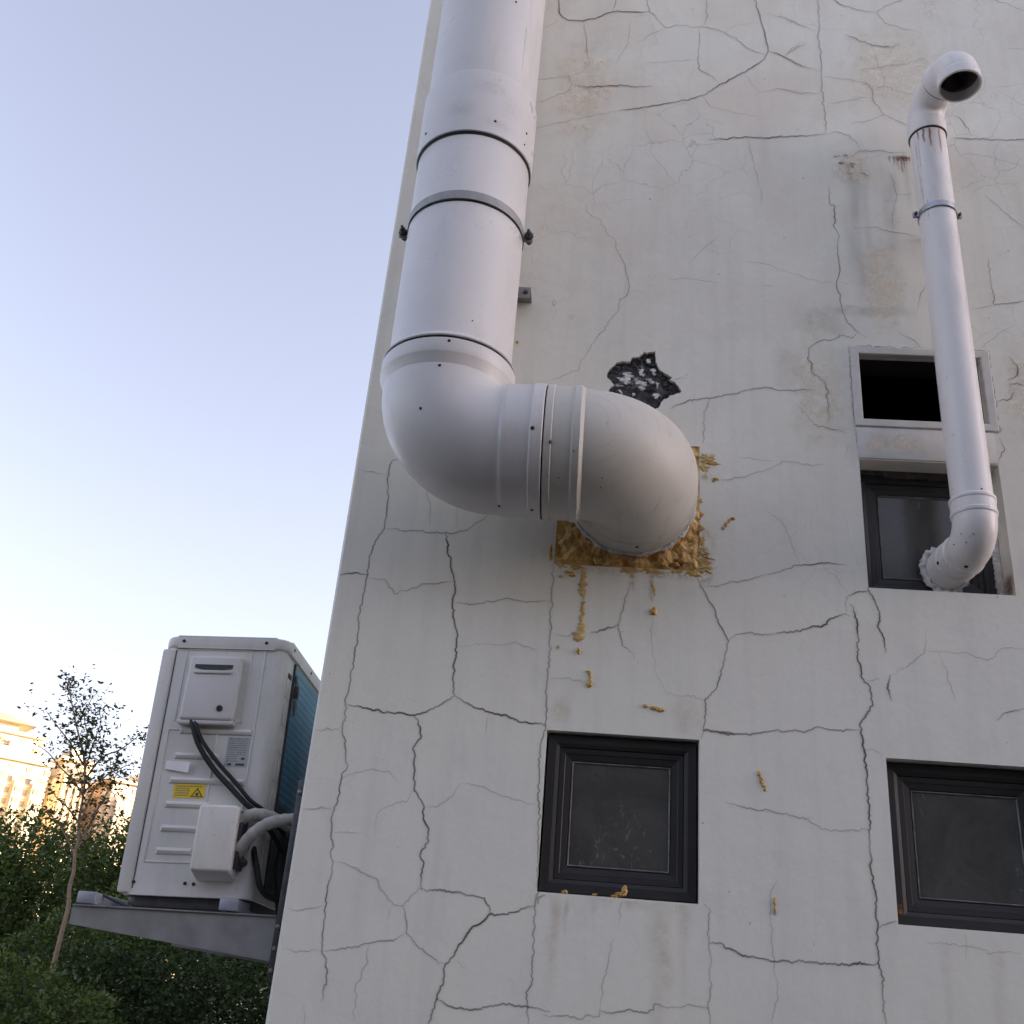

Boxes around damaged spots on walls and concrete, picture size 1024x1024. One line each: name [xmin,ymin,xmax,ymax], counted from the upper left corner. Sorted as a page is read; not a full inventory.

crack [558,0,669,55]
crack [579,2,822,110]
crack [718,90,845,140]
spalling [607,354,681,409]
crack [330,461,554,1020]
crack [701,587,890,1009]
crack [322,883,344,986]